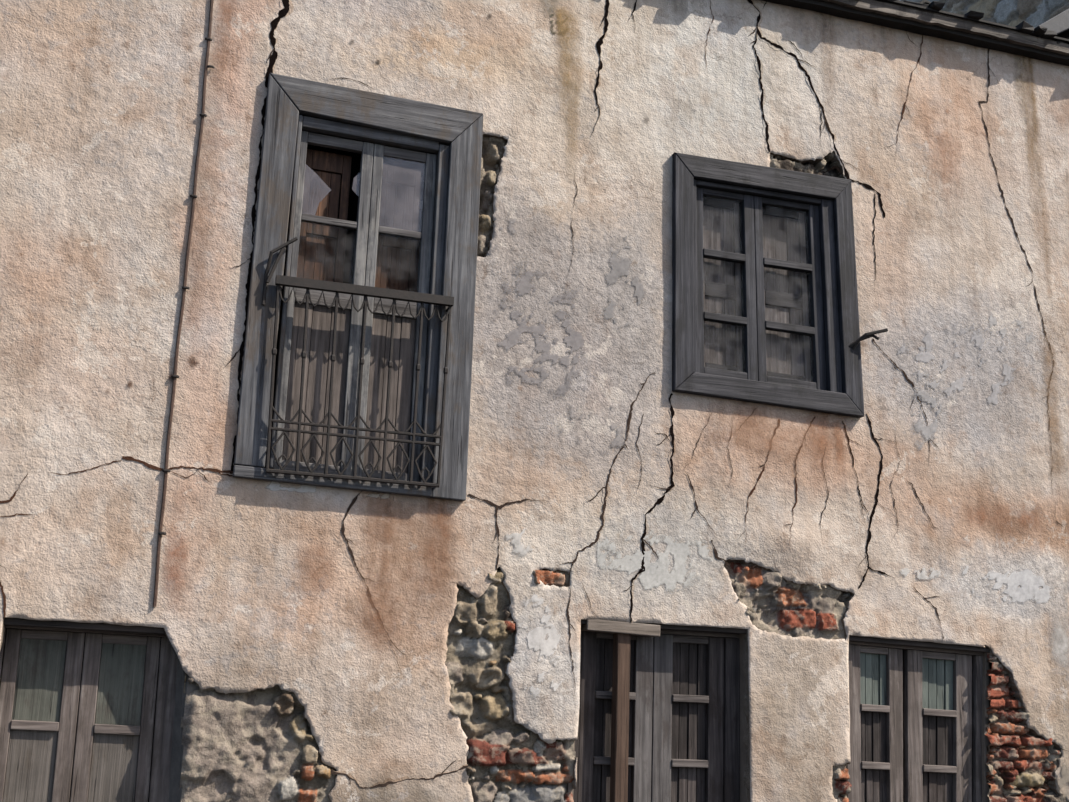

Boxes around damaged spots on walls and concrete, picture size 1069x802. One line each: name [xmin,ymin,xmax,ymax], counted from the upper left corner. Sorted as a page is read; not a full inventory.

crack [591,0,637,135]
crack [747,0,885,292]
crack [0,0,294,517]
crack [978,49,1063,535]
crack [341,491,405,671]
flaking render [497,612,515,640]
flaking render [532,569,569,587]
crack [560,339,944,694]
flaking render [724,560,851,639]
flaking render [290,779,326,802]
flaking render [465,729,575,802]
flaking render [985,652,1058,802]